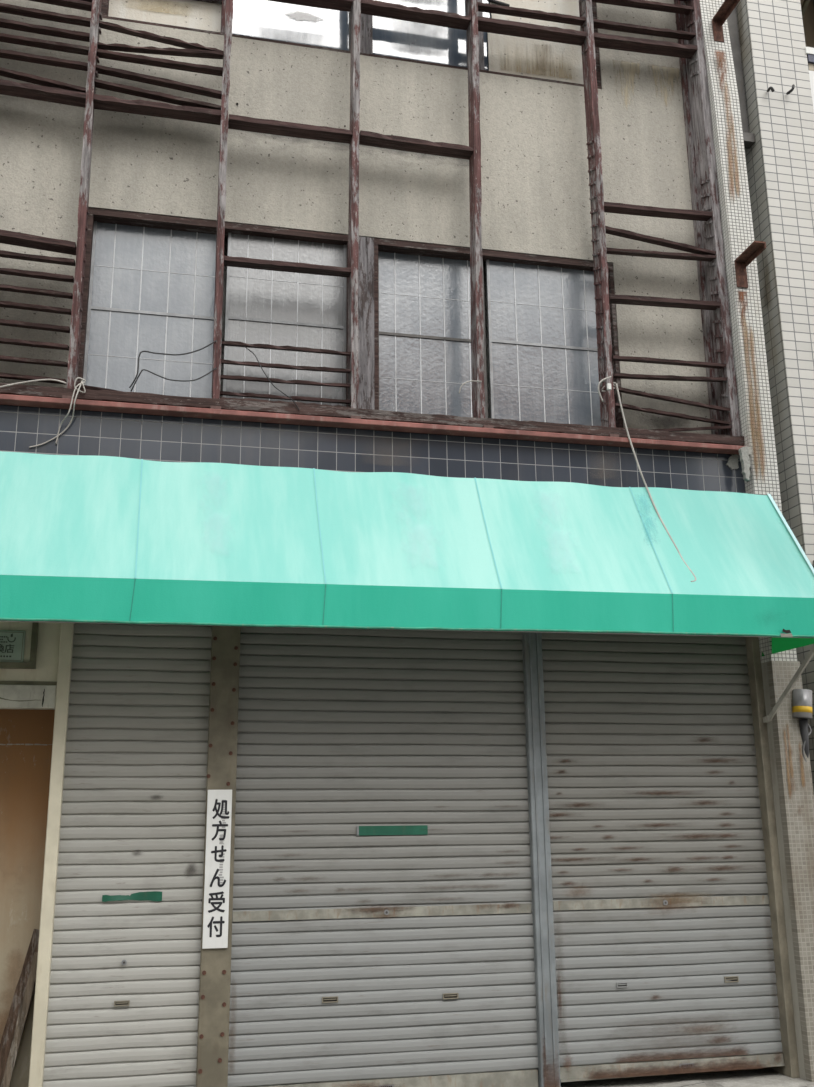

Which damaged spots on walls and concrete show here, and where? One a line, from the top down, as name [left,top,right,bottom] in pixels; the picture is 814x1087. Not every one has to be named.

rust [716,51,739,196]
rust [738,291,765,479]
rust [589,1038,763,1079]